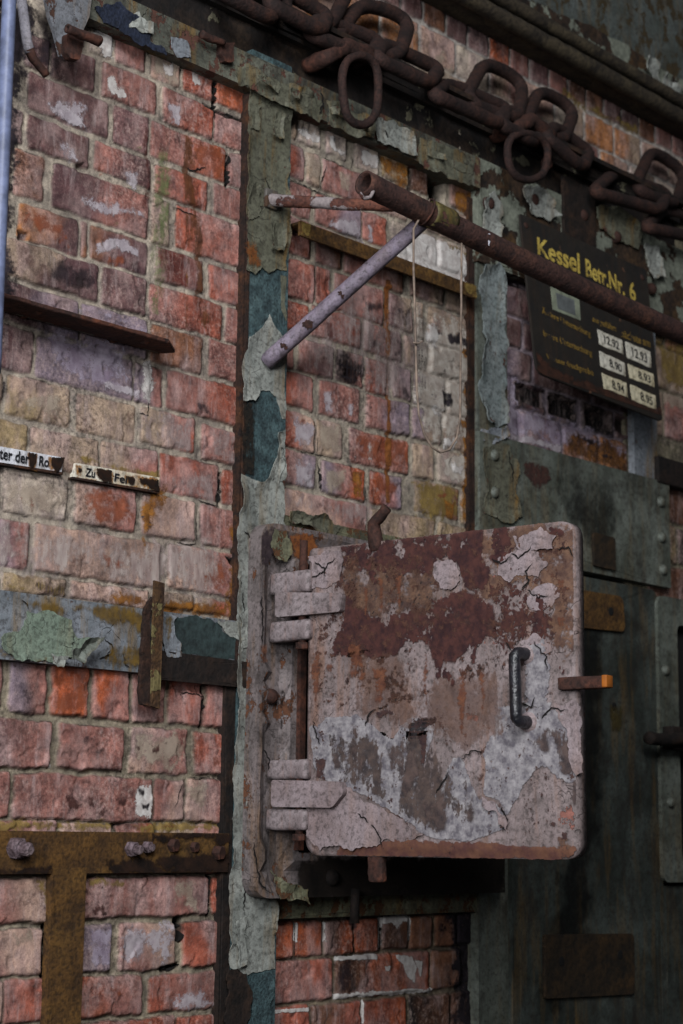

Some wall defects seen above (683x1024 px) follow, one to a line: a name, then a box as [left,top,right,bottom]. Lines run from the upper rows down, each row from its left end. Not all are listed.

peeling [596,204,667,278]
peeling [1,610,104,715]
corrosion [90,639,247,1024]
peeling [163,63,475,1024]
corrosion [308,241,574,706]
peeling [306,633,583,851]
peeling [478,262,523,523]
crack [506,642,548,667]
peeling [498,527,560,611]
crack [522,699,566,718]